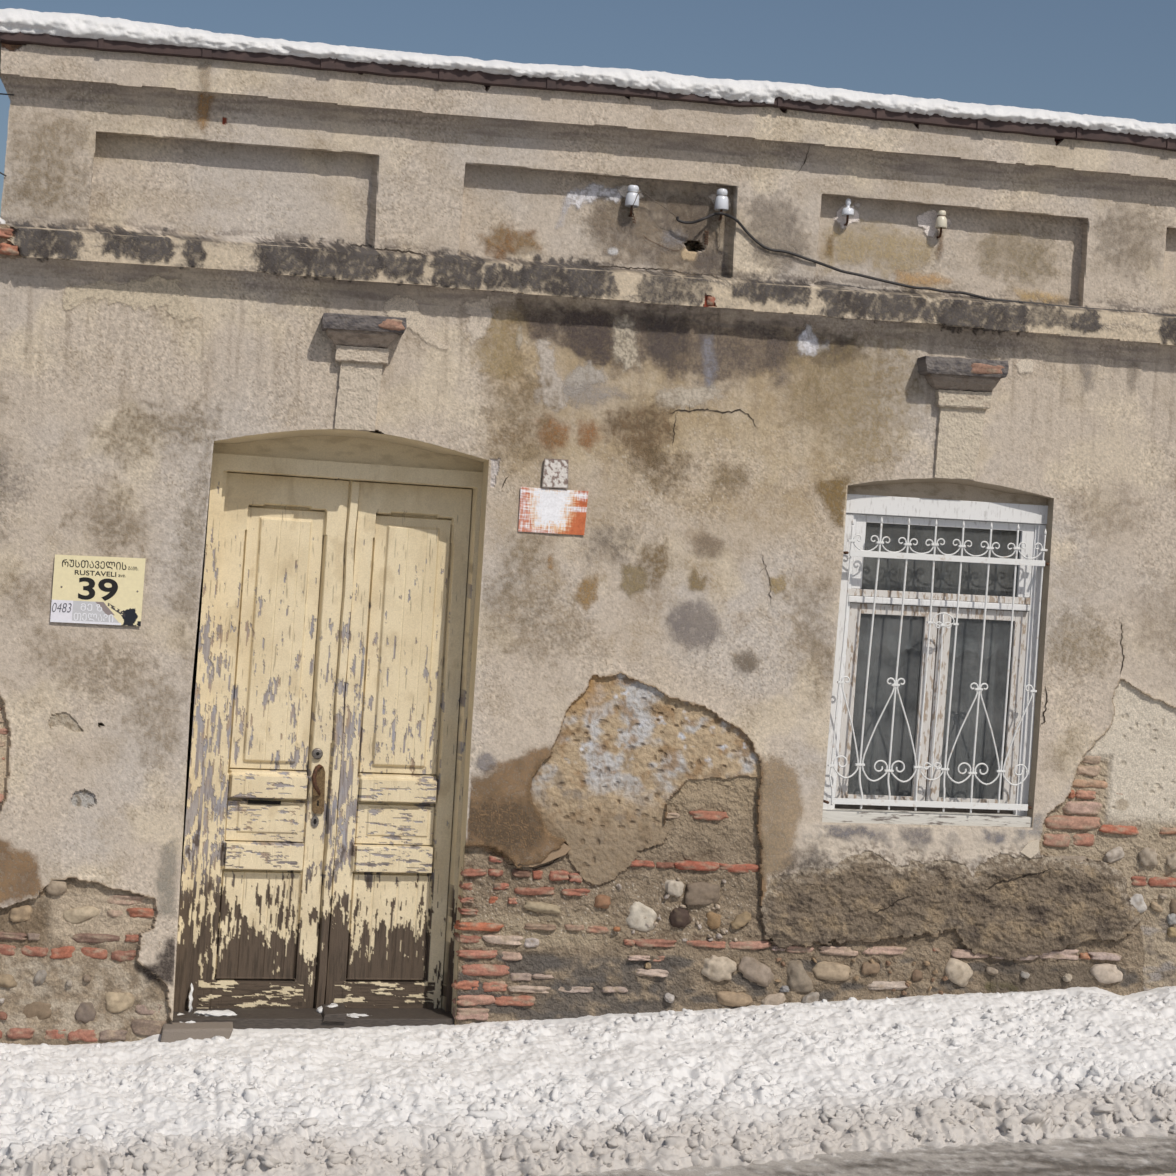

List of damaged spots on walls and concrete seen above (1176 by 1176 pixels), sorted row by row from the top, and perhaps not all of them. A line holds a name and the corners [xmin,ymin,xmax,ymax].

leakage [482,298,917,462]
leakage [604,406,689,492]
crack [666,404,755,446]
leakage [577,578,597,610]
leakage [593,527,668,595]
leakage [690,569,706,589]
flaking render [0,696,11,812]
flaking render [49,713,84,733]
flaking render [71,790,97,809]
flaking render [451,674,1176,1025]
flaking render [0,878,173,1045]